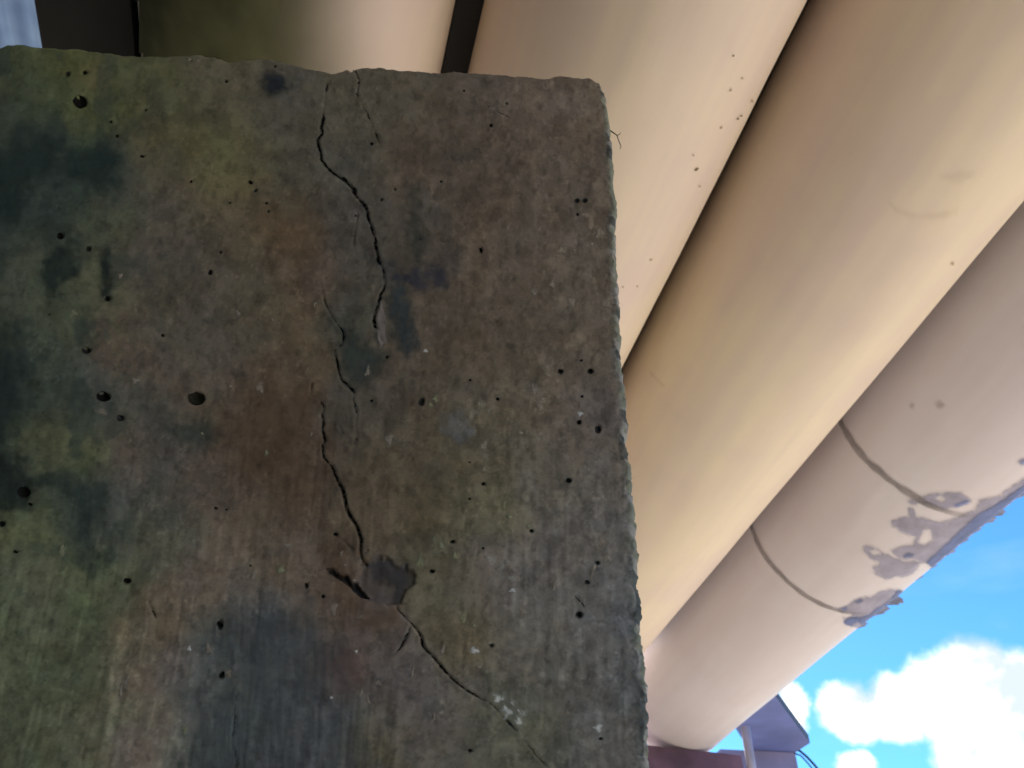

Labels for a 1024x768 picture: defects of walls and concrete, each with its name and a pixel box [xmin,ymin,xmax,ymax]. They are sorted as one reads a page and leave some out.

crack [317,84,386,330]
crack [311,300,367,565]
peeling [840,480,1024,629]
crack [397,608,543,762]